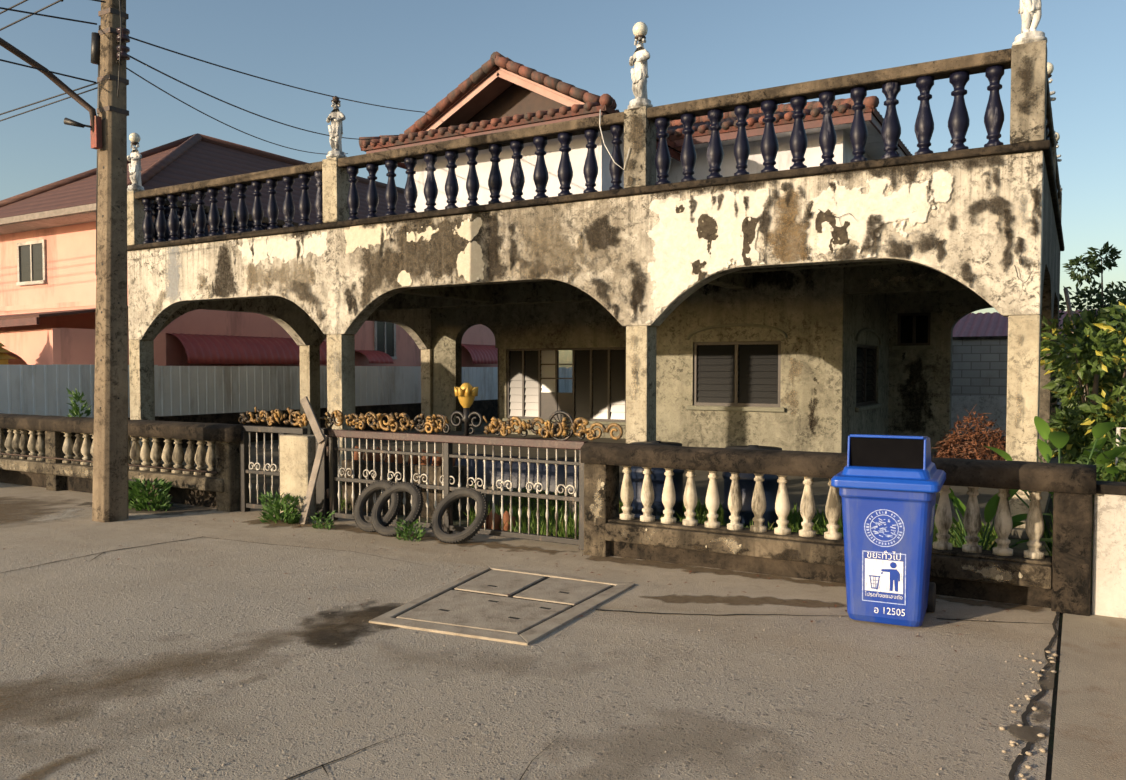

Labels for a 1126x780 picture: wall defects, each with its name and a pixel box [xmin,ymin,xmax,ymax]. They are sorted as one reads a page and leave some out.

damp [198,231,336,330]
peeling [344,223,391,254]
peeling [406,226,439,242]
peeling [454,217,485,282]
damp [336,210,646,390]
peeling [645,188,769,324]
damp [655,180,814,294]
peeling [810,168,954,258]
damp [823,154,1041,272]
damp [301,604,400,648]
damp [0,653,244,720]